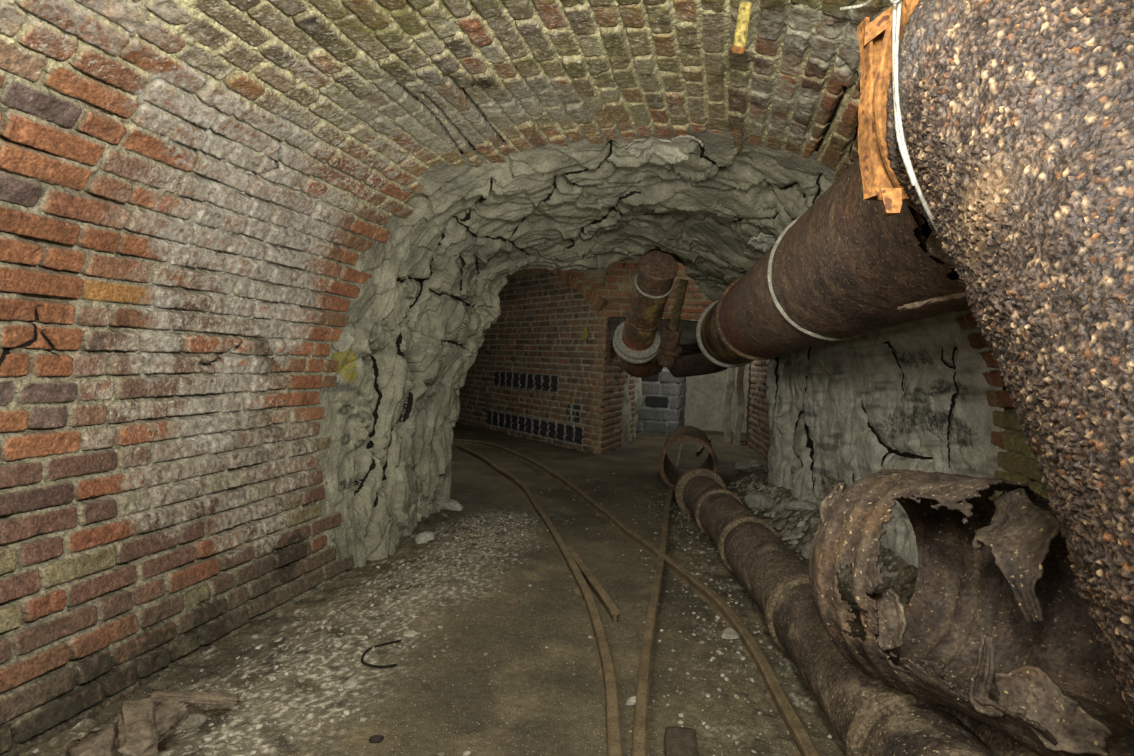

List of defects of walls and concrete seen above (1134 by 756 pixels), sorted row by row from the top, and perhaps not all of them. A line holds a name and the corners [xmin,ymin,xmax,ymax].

crack [397,76,504,154]
crack [699,144,727,169]
crack [567,191,687,249]
crack [0,308,60,366]
crack [354,140,613,508]
crack [773,346,815,493]
crack [861,341,959,468]